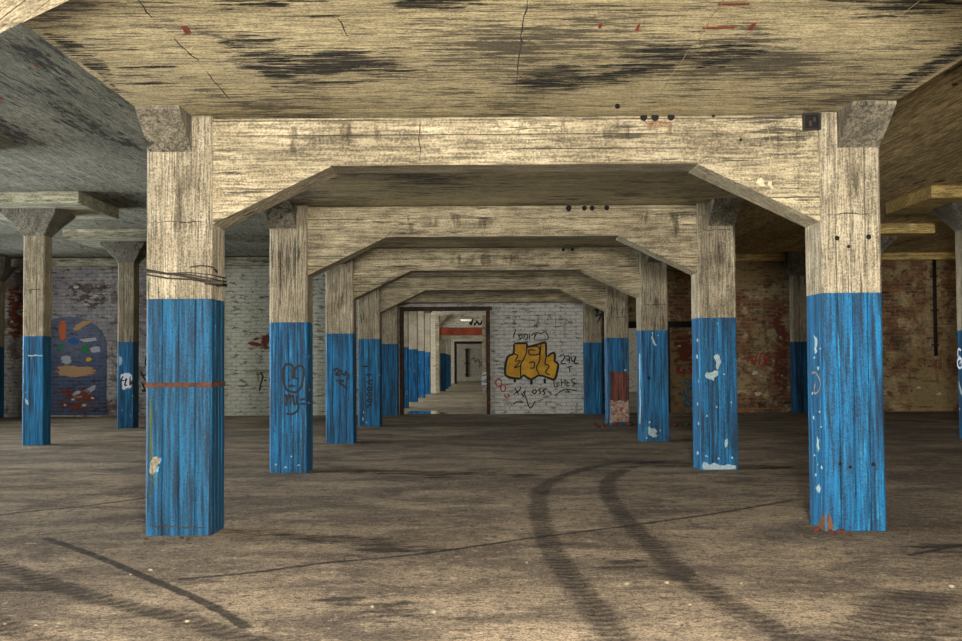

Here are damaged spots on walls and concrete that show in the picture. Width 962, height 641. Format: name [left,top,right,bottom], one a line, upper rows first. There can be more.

water stain [217,0,345,18]
water stain [367,0,483,9]
water stain [212,23,417,88]
water stain [514,42,769,90]
crack [657,0,724,98]
peeling [698,354,725,383]
flaking render [749,301,789,403]
peeling [610,353,661,439]
peeling [697,439,736,470]